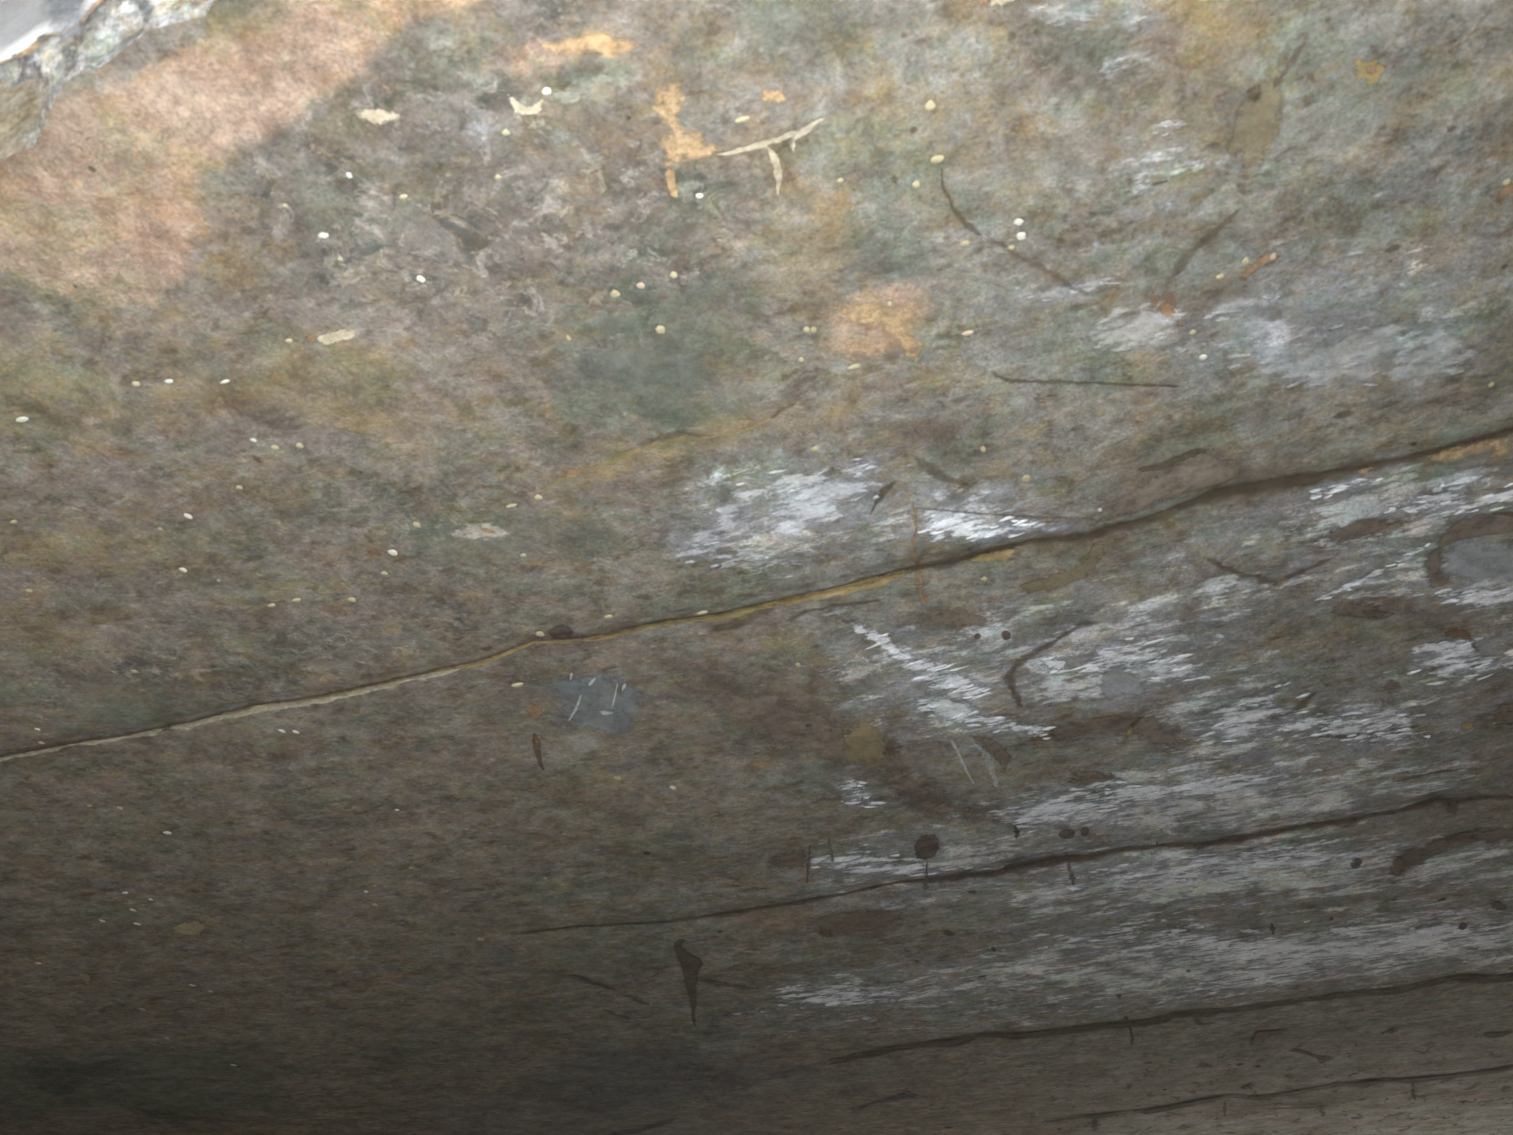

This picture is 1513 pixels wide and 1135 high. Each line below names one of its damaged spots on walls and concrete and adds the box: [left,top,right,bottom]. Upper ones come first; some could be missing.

rust [653,83,722,198]
crack [870,482,950,604]
leakage [917,507,1084,543]
crack [1209,557,1334,586]
leakage [854,622,1055,740]
crack [1005,621,1096,707]
leakage [1041,637,1216,696]
crack [1254,691,1418,741]
leakage [1184,637,1513,748]
leakage [979,762,1295,833]
crack [1394,768,1464,782]
leakage [1028,909,1513,1001]